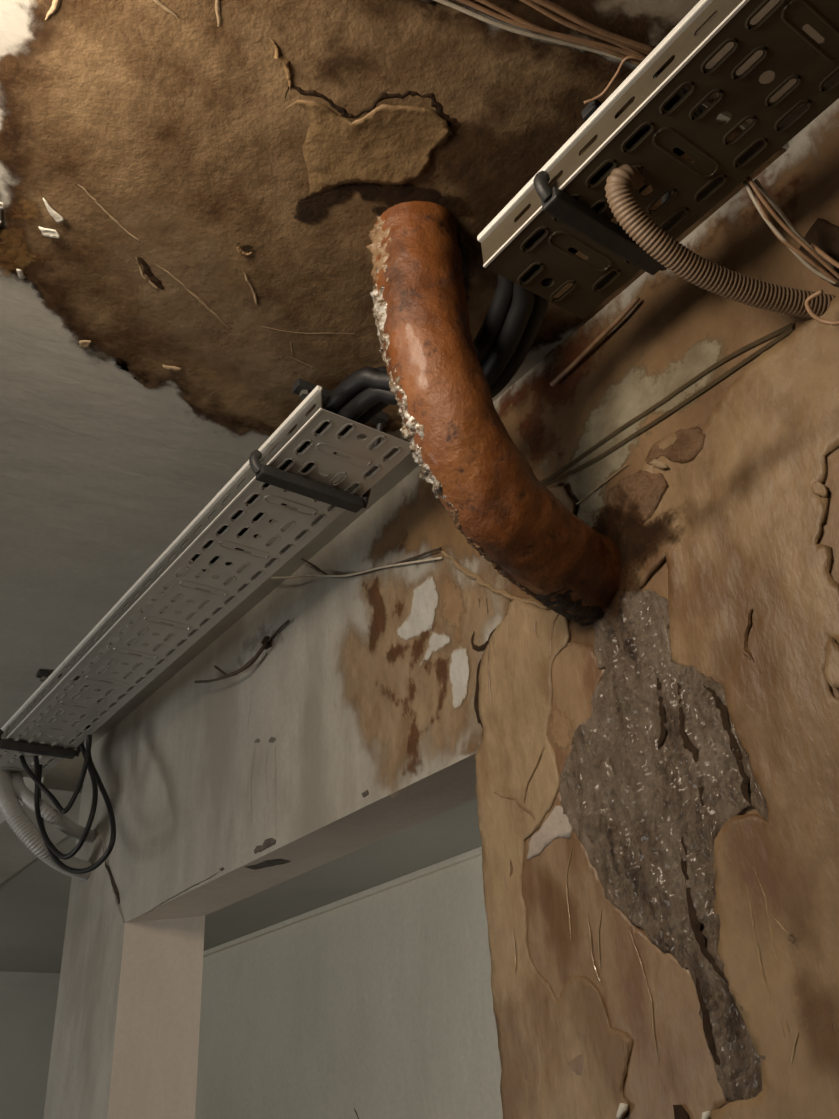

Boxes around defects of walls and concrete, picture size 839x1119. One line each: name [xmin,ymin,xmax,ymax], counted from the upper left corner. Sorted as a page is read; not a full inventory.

peeling [38,198,65,239]
crack [270,38,461,128]
peeling [287,100,452,198]
leakage [676,111,839,297]
leakage [0,0,679,617]
leakage [496,269,809,528]
leakage [818,448,839,583]
leakage [568,619,595,646]
flaking render [397,218,839,1119]